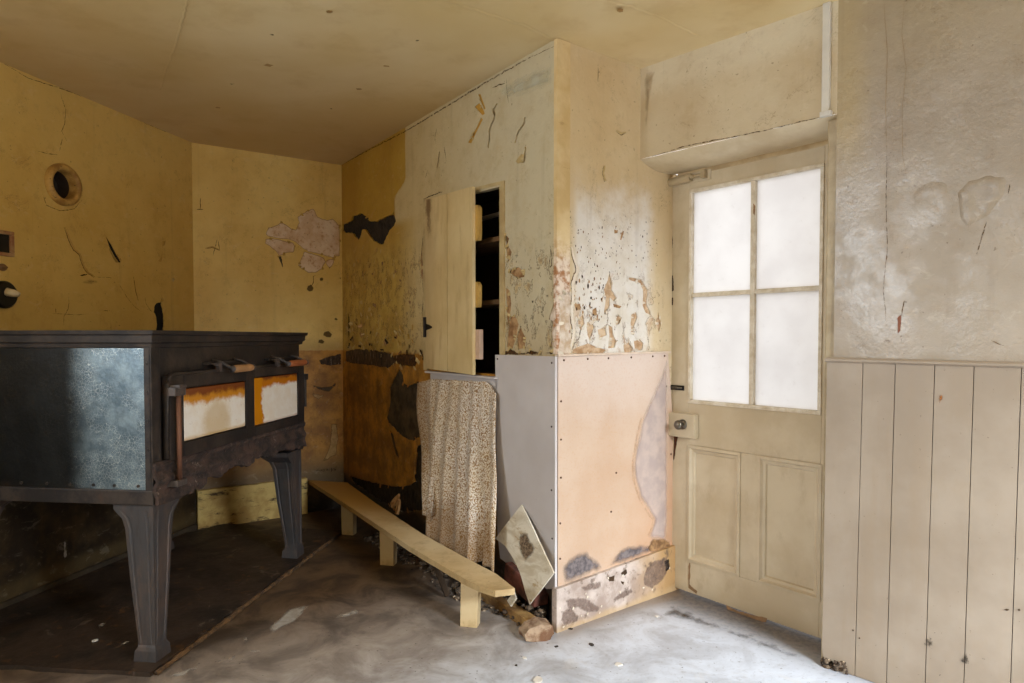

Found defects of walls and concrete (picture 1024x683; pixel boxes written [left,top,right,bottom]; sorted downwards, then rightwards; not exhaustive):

crack [349,46,554,199]
crack [883,9,907,316]
crack [44,199,151,316]
flaking render [265,209,396,273]
flaking render [505,233,525,279]
flaking render [506,288,526,349]
peeling [549,223,662,354]
flaking render [319,318,423,513]
leakage [616,373,670,561]
peeling [507,558,670,630]